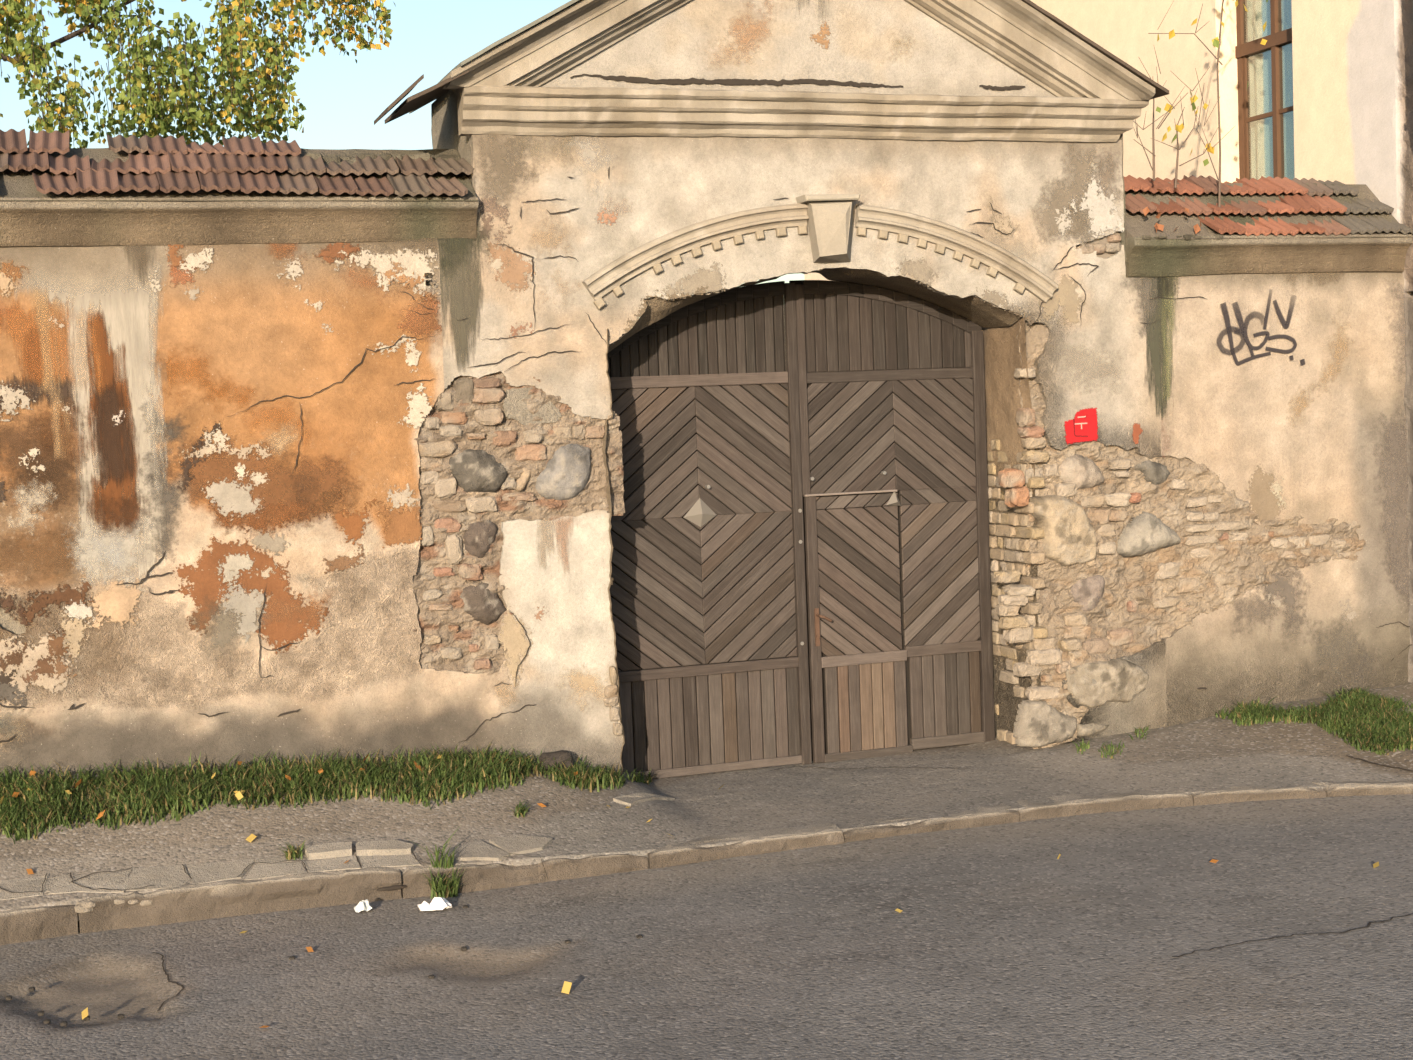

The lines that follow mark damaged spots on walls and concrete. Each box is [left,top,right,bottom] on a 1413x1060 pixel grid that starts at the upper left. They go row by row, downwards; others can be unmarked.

crack [570,74,903,87]
peeling [0,380,36,422]
peeling [18,448,45,473]
water stain [0,245,351,626]
peeling [179,423,290,644]
peeling [334,247,440,302]
crack [227,177,607,473]
flaking render [323,334,625,698]
water stain [1133,277,1175,397]
flaking render [976,274,1366,749]
peeling [0,579,146,710]
crack [1172,914,1411,957]